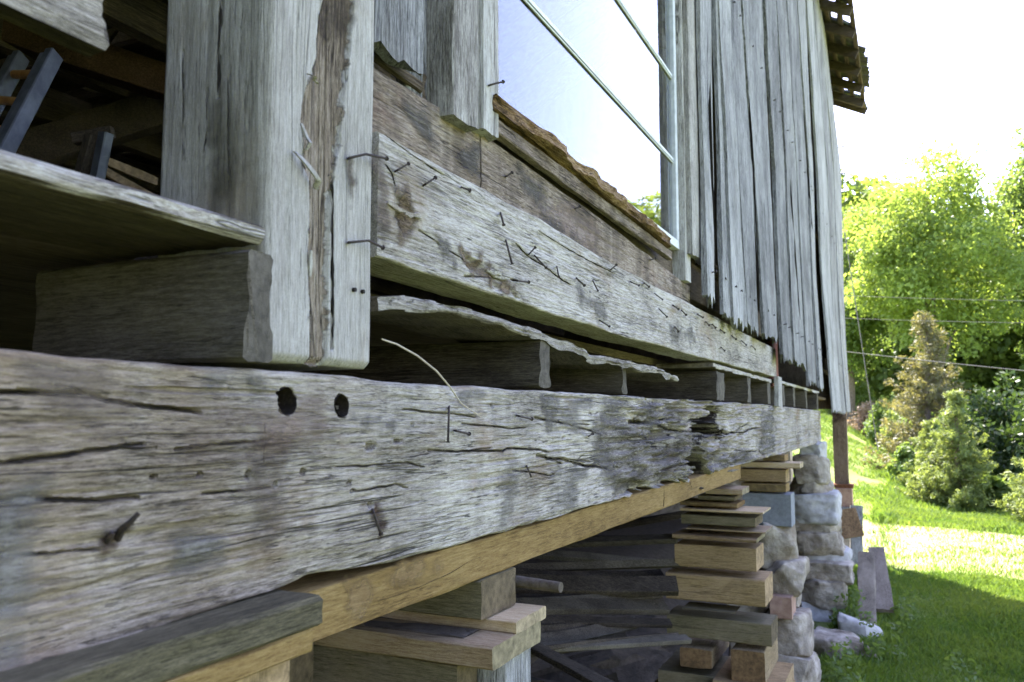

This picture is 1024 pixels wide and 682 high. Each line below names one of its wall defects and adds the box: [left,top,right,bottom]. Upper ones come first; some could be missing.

crack [327,178,335,342]
crack [0,387,201,413]
crack [0,444,152,464]
crack [183,422,265,458]
crack [343,409,608,491]
spalling [595,398,695,493]
spalling [707,443,757,473]
crack [35,495,139,503]
crack [206,486,268,494]
rust [372,503,386,537]
crack [20,547,99,555]